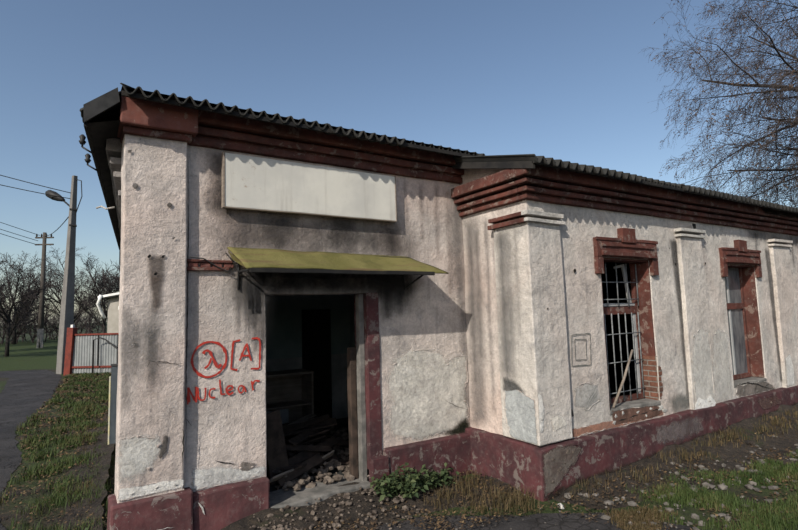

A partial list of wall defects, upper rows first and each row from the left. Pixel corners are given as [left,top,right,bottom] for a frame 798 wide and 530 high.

damp [150,257,163,304]
crack [147,271,189,391]
peeling [117,435,265,501]
peeling [504,356,667,498]